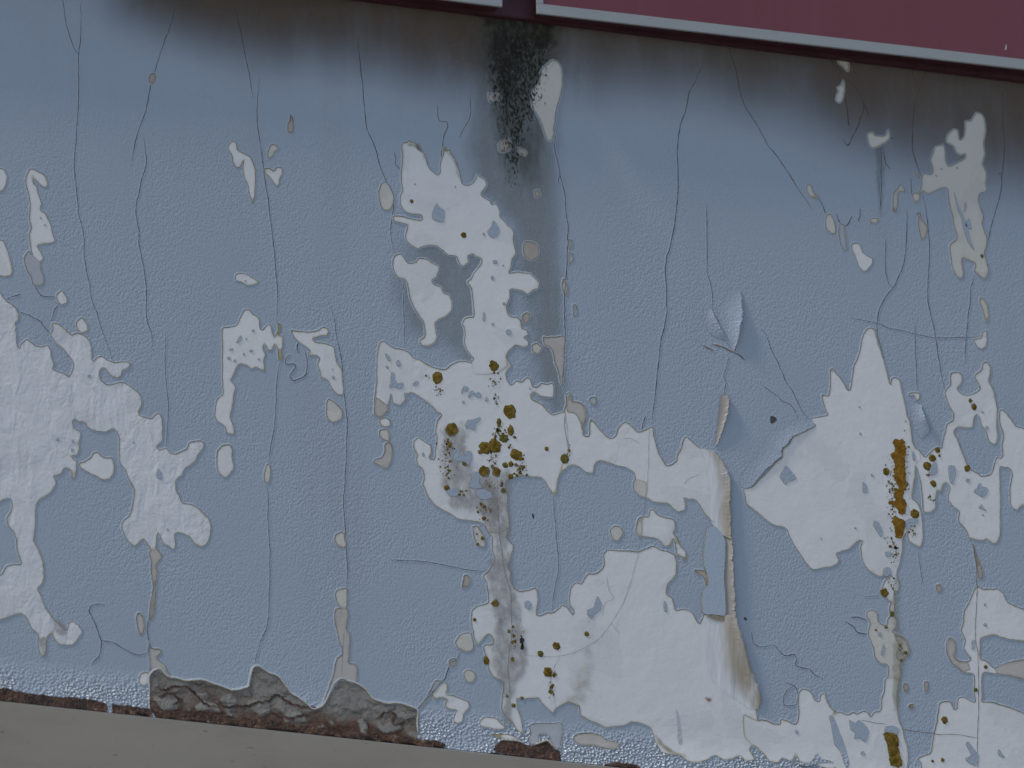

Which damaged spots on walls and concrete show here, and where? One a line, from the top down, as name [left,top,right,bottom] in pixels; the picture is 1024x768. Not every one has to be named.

peeling [0,238,471,738]
peeling [372,137,1024,768]